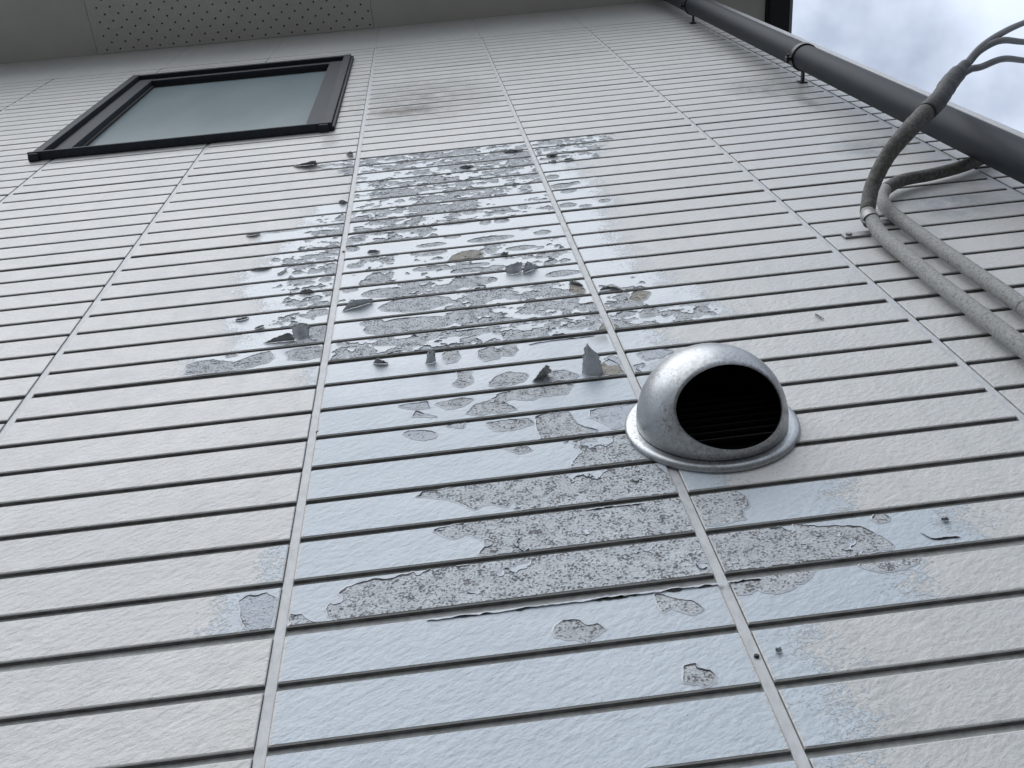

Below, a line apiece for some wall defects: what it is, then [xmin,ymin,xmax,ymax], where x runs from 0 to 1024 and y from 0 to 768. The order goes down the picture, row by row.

peeling [163,133,1012,768]
crack [427,578,761,620]